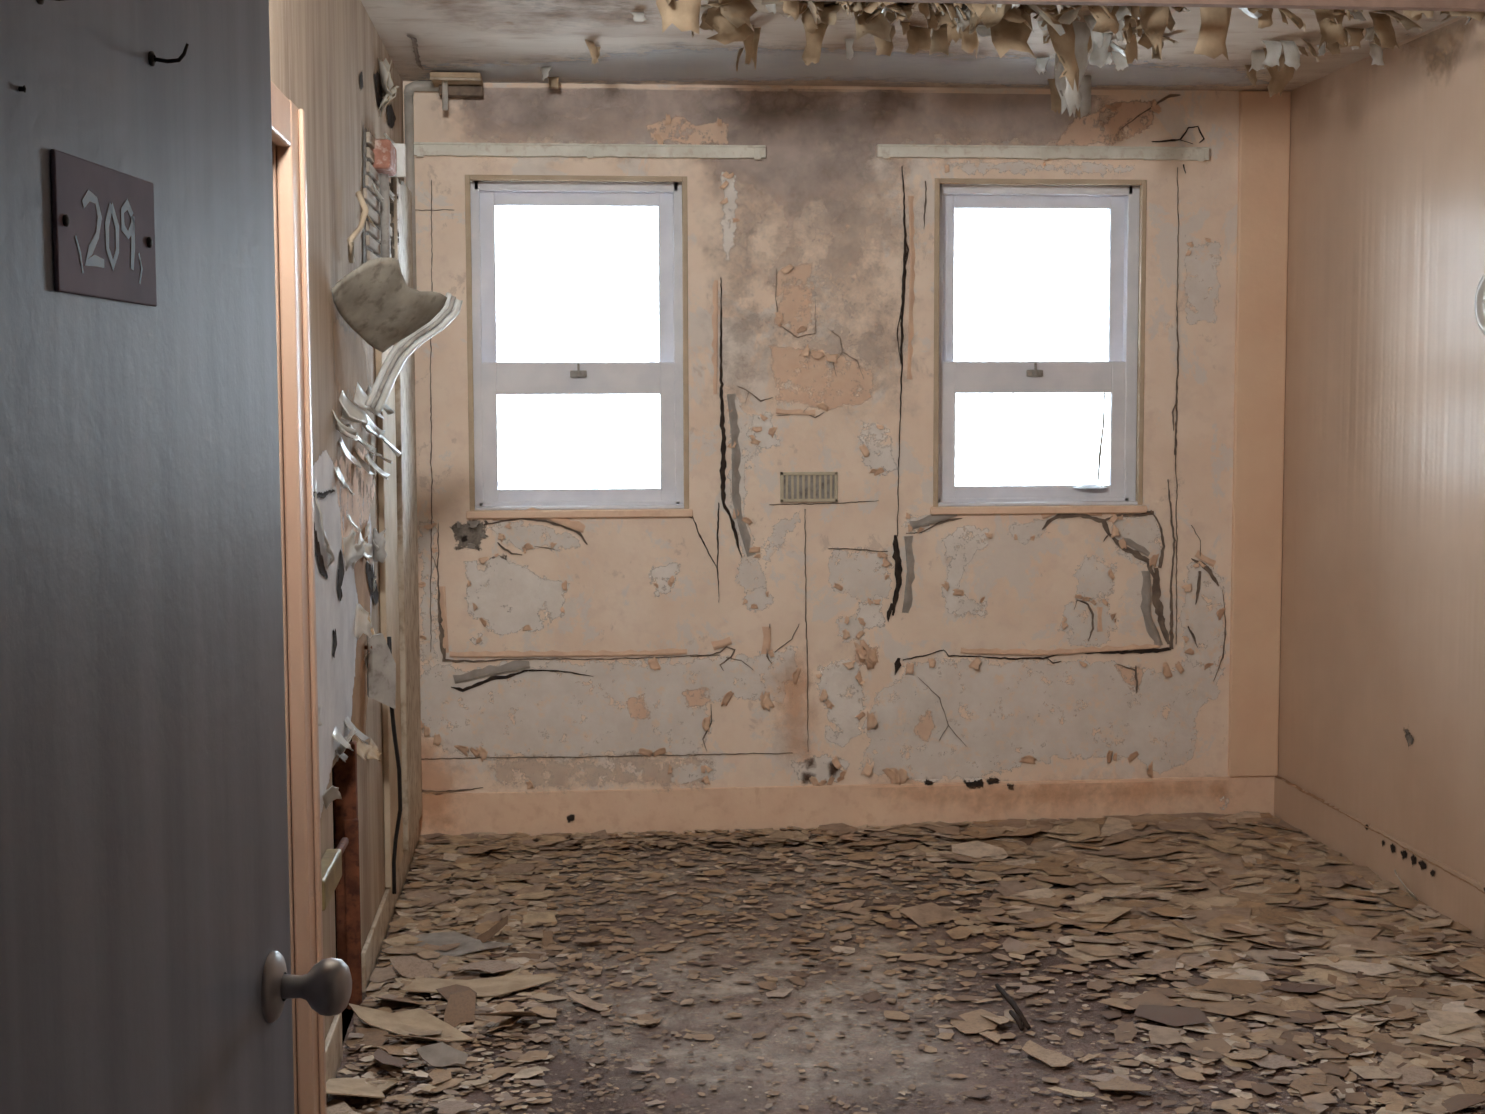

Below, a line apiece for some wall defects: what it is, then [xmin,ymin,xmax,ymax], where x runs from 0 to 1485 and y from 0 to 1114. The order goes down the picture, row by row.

peeling [313,258,463,819]
crack [419,166,962,795]
peeling [720,171,740,260]
peeling [727,396,801,612]
peeling [630,0,1485,146]
crack [894,94,1226,747]